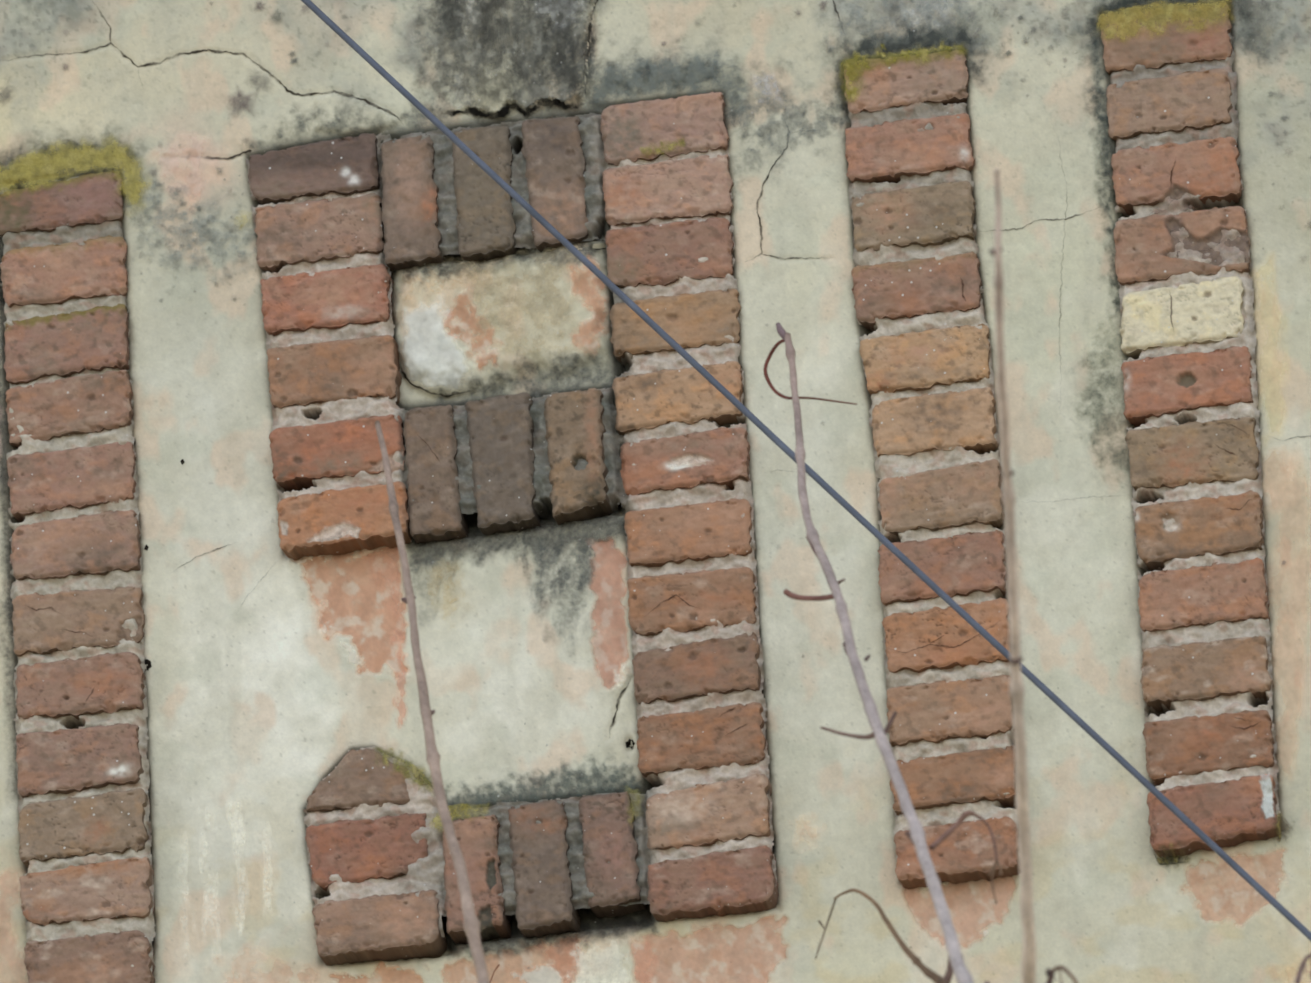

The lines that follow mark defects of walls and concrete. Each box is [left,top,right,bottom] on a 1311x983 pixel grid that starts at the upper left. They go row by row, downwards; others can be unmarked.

crack [6,11,401,121]
leakage [414,0,597,126]
crack [584,0,598,94]
crack [201,150,252,160]
crack [754,144,822,260]
peeling [294,546,408,726]
peeling [590,539,629,689]
peeling [0,870,55,983]
peeling [441,939,581,983]
peeling [630,915,788,983]
peeling [904,876,1016,948]
peeling [1181,848,1285,926]